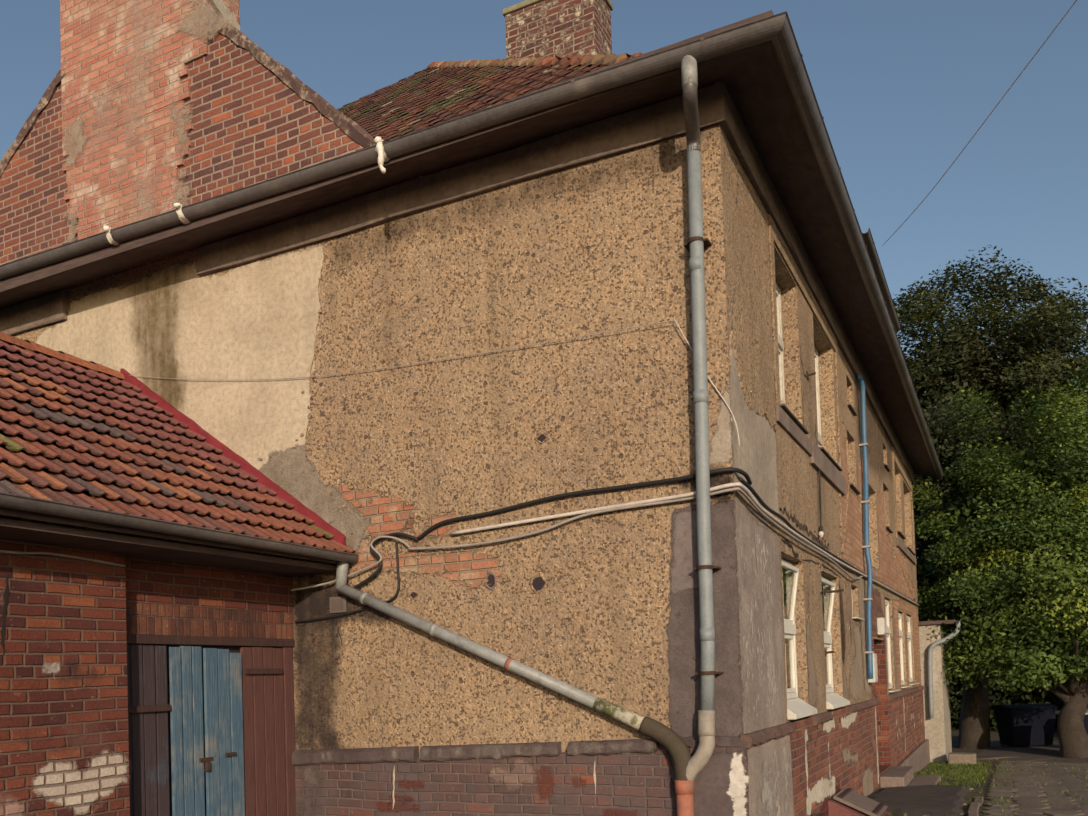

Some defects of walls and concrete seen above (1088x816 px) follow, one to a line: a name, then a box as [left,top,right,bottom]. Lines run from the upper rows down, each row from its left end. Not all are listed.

damp [134,270,181,406]
flaking render [258,433,511,600]
peeling [739,533,783,723]
flaking render [779,414,922,815]
peeling [726,744,792,816]